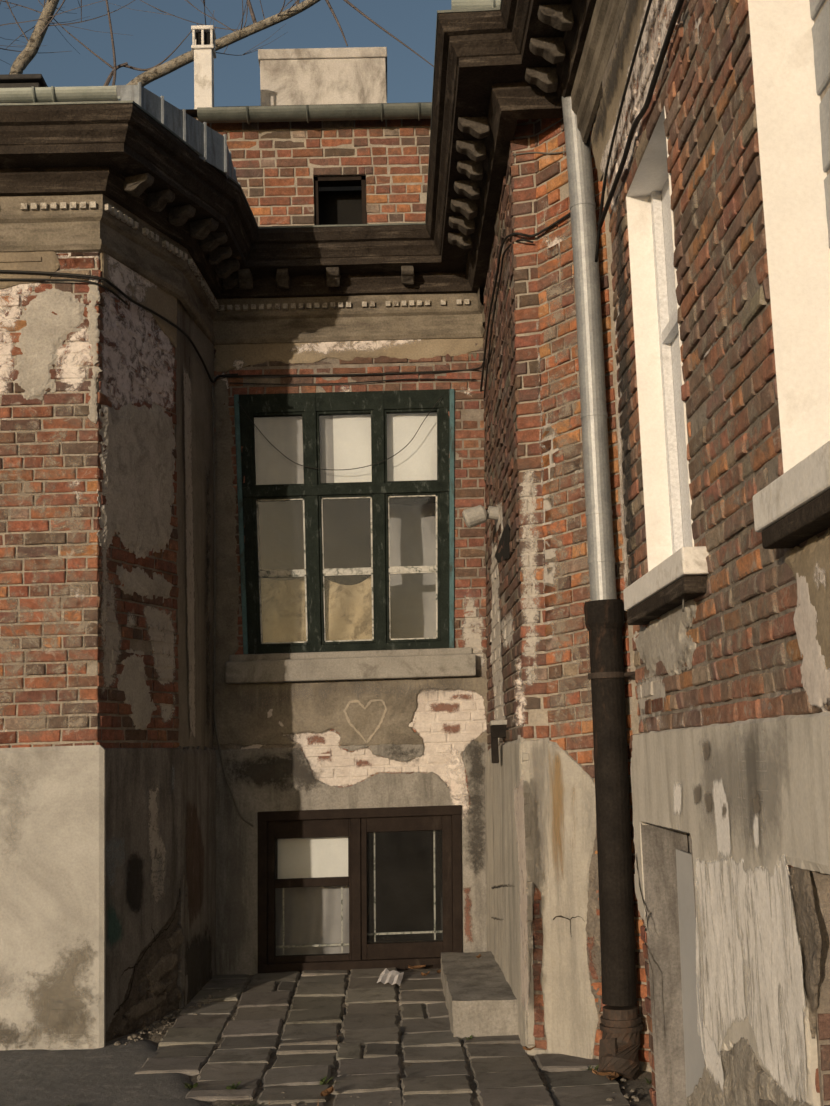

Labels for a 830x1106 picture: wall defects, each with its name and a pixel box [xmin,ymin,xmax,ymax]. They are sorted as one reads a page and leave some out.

peeling [0,282,40,397]
leakage [228,748,317,790]
spalling [267,690,487,808]
spalling [105,876,188,1043]
peeling [673,779,822,1106]